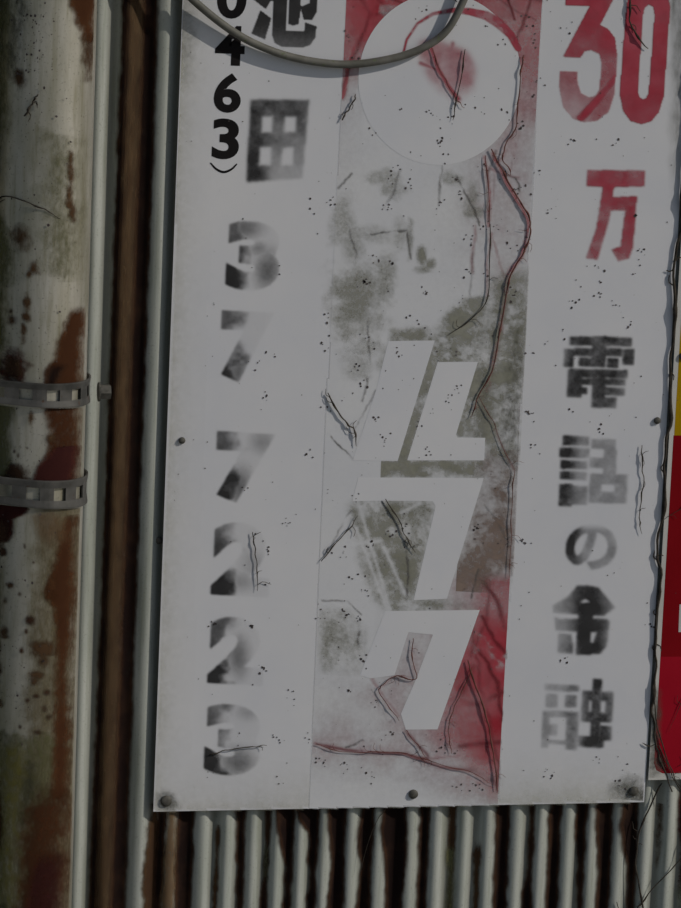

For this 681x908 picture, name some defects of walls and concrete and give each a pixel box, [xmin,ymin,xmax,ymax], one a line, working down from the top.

corrosion [45,310,86,384]
corrosion [2,408,81,481]
corrosion [88,0,158,908]
corrosion [16,517,79,908]
corrosion [142,804,195,908]
corrosion [236,810,246,908]
corrosion [260,808,347,908]
corrosion [355,806,430,908]
corrosion [493,805,510,908]
corrosion [522,804,535,908]
corrosion [546,804,563,908]
corrosion [575,802,639,908]